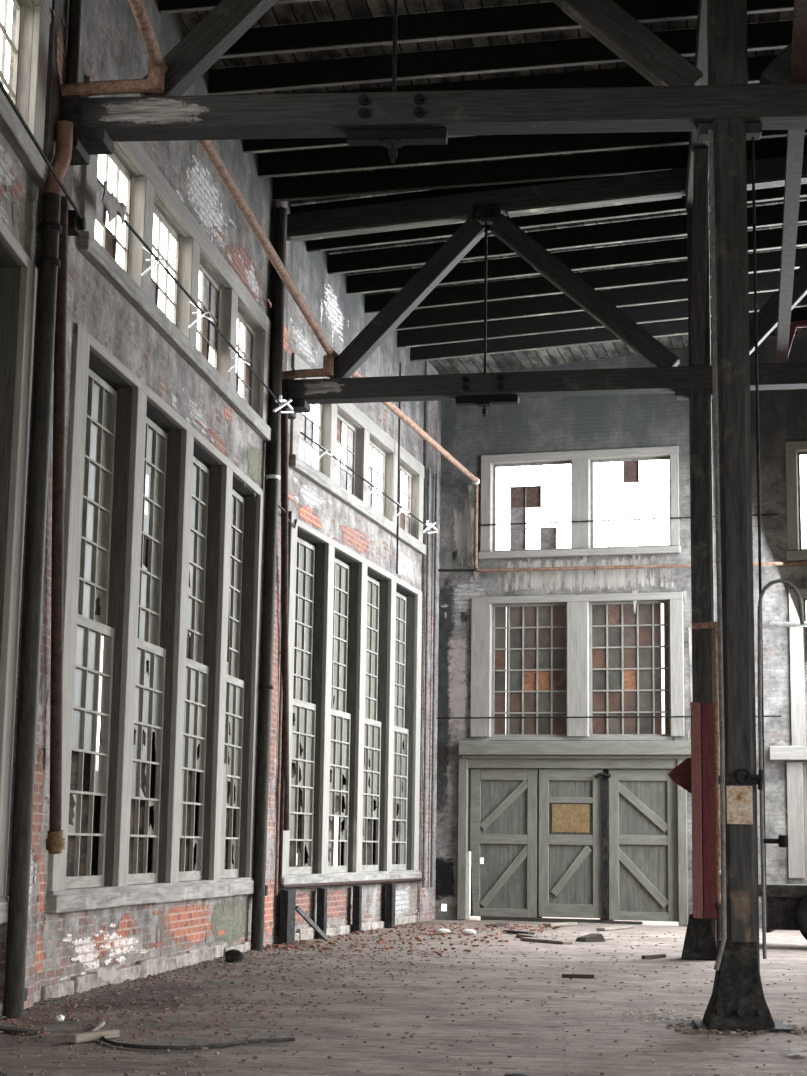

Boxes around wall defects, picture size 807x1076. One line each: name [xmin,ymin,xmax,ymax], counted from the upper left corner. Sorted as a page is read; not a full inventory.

flaking render [62,898,225,975]